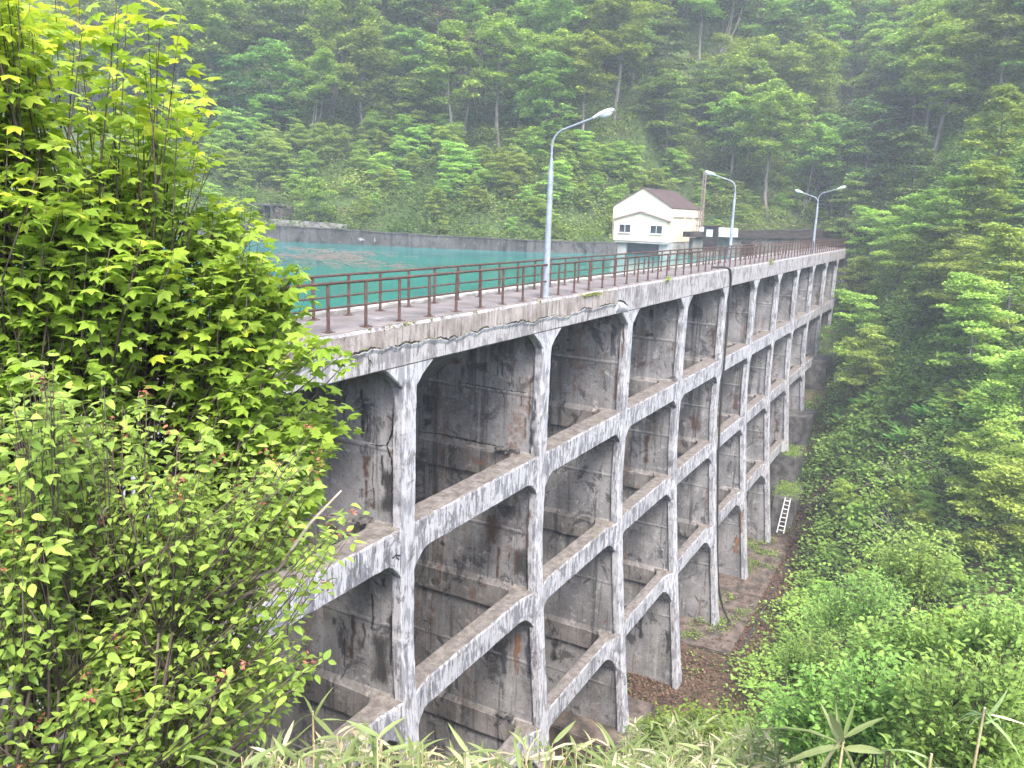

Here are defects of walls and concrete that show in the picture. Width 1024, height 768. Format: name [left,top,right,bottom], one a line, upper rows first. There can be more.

rust [363,457,375,509]
crack [371,398,395,491]
rust [343,617,366,668]
damp [371,594,393,683]